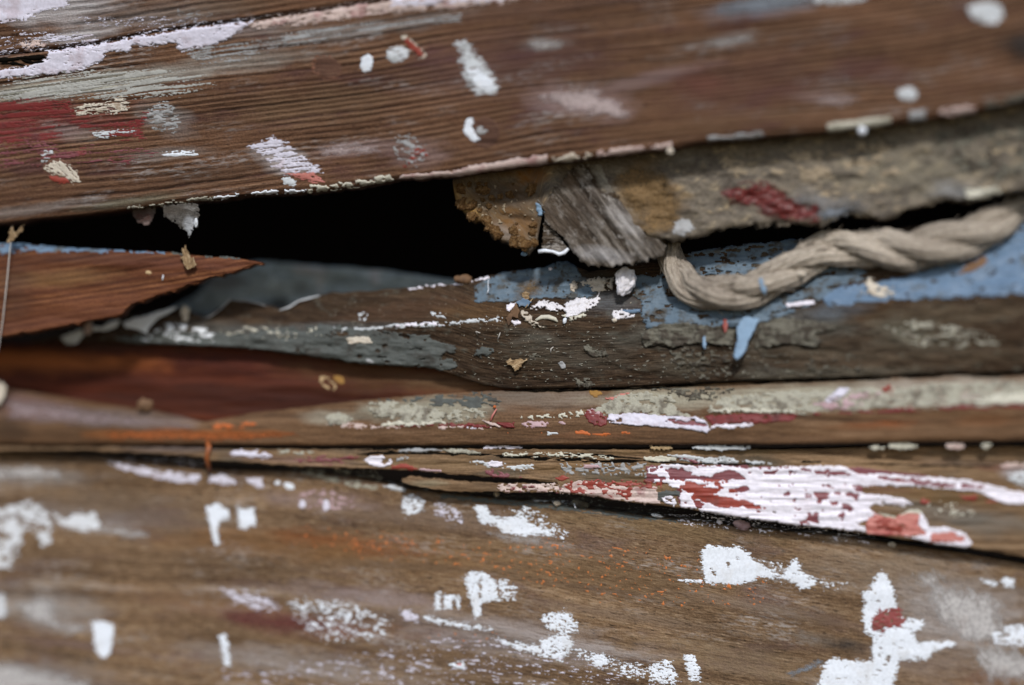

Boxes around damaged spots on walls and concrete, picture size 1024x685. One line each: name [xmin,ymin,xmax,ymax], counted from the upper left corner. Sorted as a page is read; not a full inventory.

peeling [0,0,517,185]
peeling [61,219,1024,548]